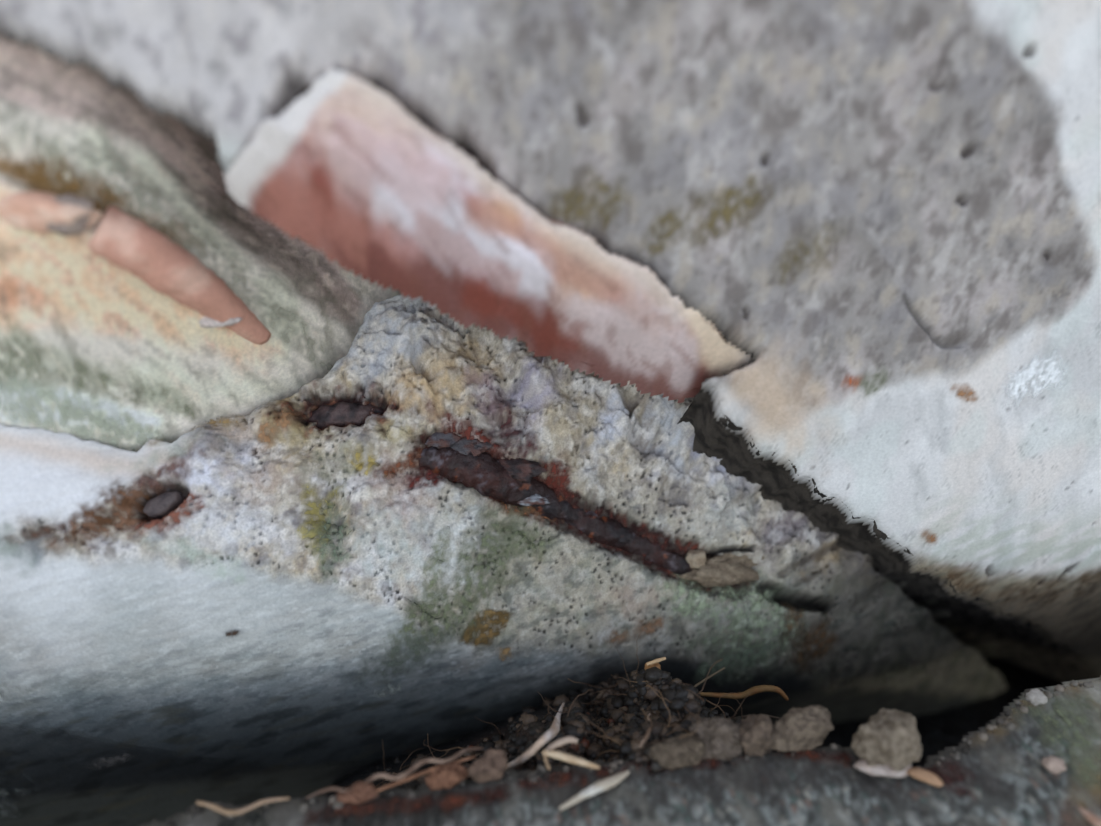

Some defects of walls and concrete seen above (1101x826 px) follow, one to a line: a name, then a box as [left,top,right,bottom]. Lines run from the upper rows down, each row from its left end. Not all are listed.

rust [22,460,204,546]
rust [258,387,398,443]
rust [381,434,462,489]
rust [444,399,537,460]
spalling [5,51,1013,702]
rust [532,462,709,556]
rust [489,496,753,602]
crack [677,381,1097,681]
spalling [1037,561,1082,586]